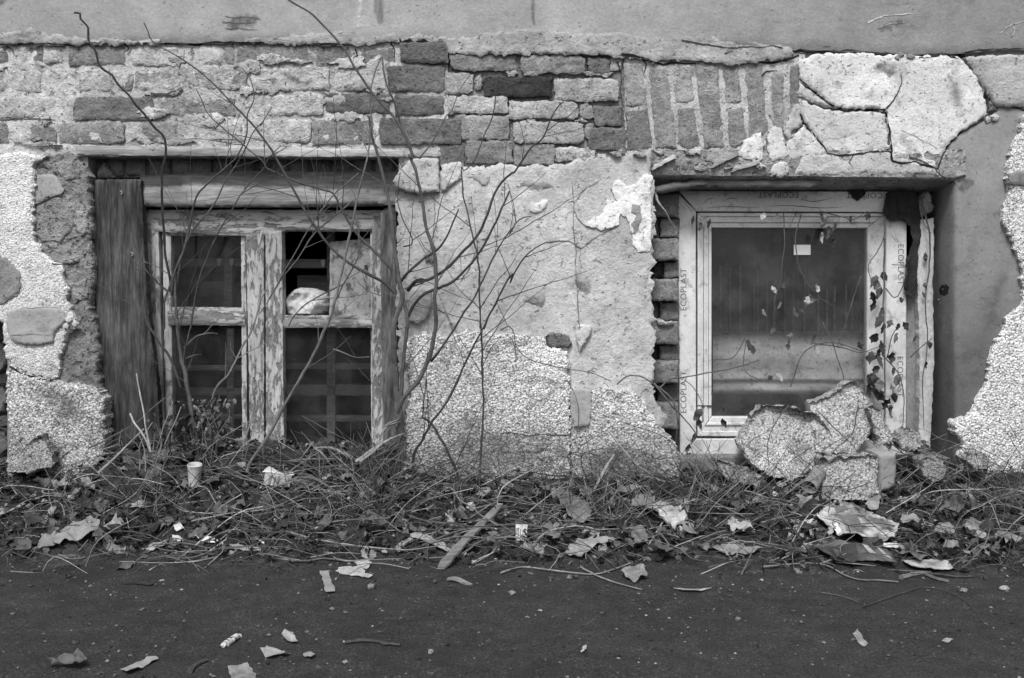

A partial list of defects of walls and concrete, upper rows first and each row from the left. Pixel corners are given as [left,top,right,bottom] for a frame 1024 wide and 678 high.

flaking render [0,42,664,389]
spalling [570,387,592,427]
crack [616,39,1024,179]
peeling [684,52,1024,416]